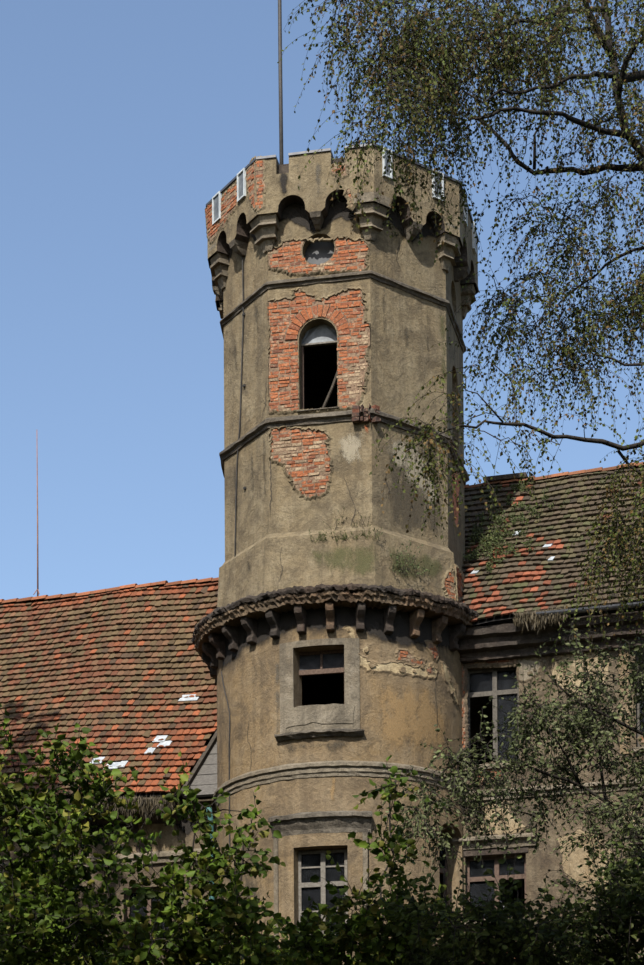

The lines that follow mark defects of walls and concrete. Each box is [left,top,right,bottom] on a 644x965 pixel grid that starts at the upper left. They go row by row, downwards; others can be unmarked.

flaking render [205,155,268,245]
flaking render [267,235,381,501]
peeling [341,625,611,750]